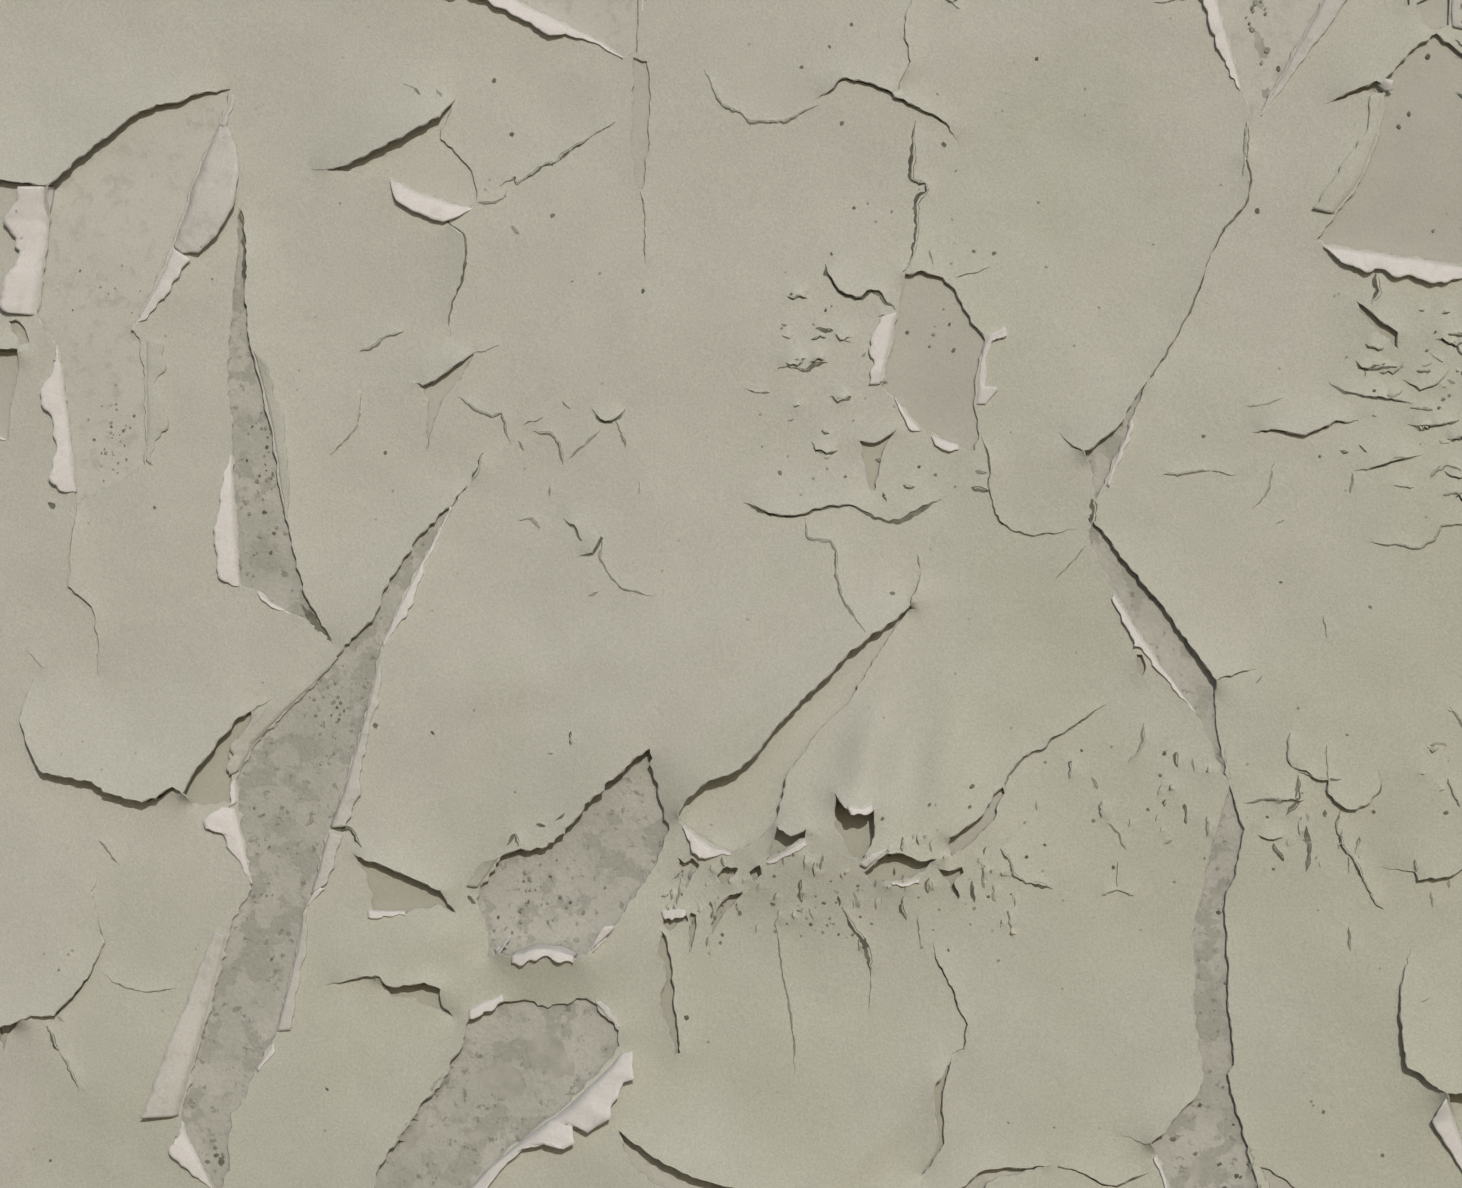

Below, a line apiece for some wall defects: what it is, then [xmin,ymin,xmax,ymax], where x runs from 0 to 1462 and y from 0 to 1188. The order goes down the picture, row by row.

peeling [0,0,1103,1188]
peeling [1048,494,1462,1188]
peeling [1203,0,1346,172]
peeling [1239,0,1462,550]